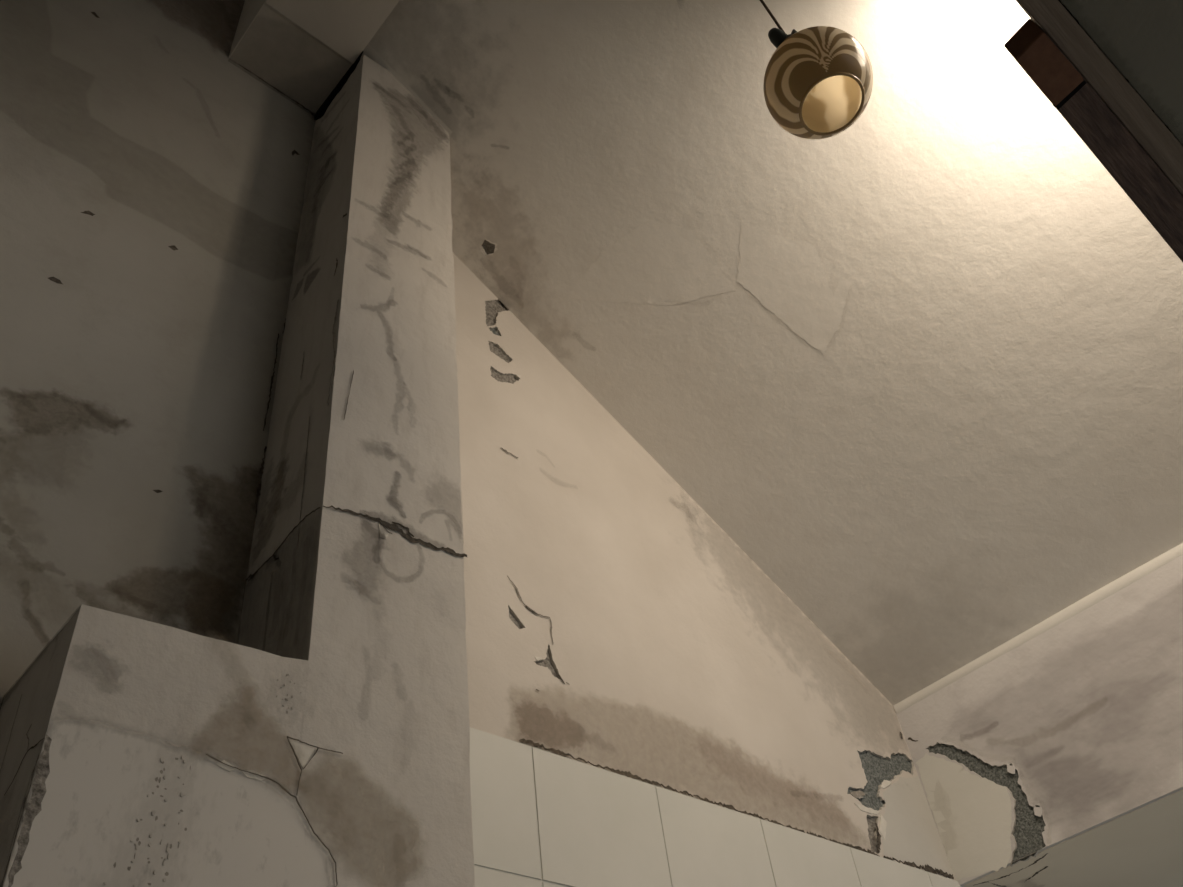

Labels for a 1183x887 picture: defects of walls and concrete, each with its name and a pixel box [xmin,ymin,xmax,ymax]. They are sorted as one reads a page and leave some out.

spalling [482,240,495,255]
spalling [485,301,521,384]
crack [246,258,468,581]
crack [507,575,553,643]
crack [206,736,343,887]
spalling [847,751,912,853]
spalling [928,744,1046,864]